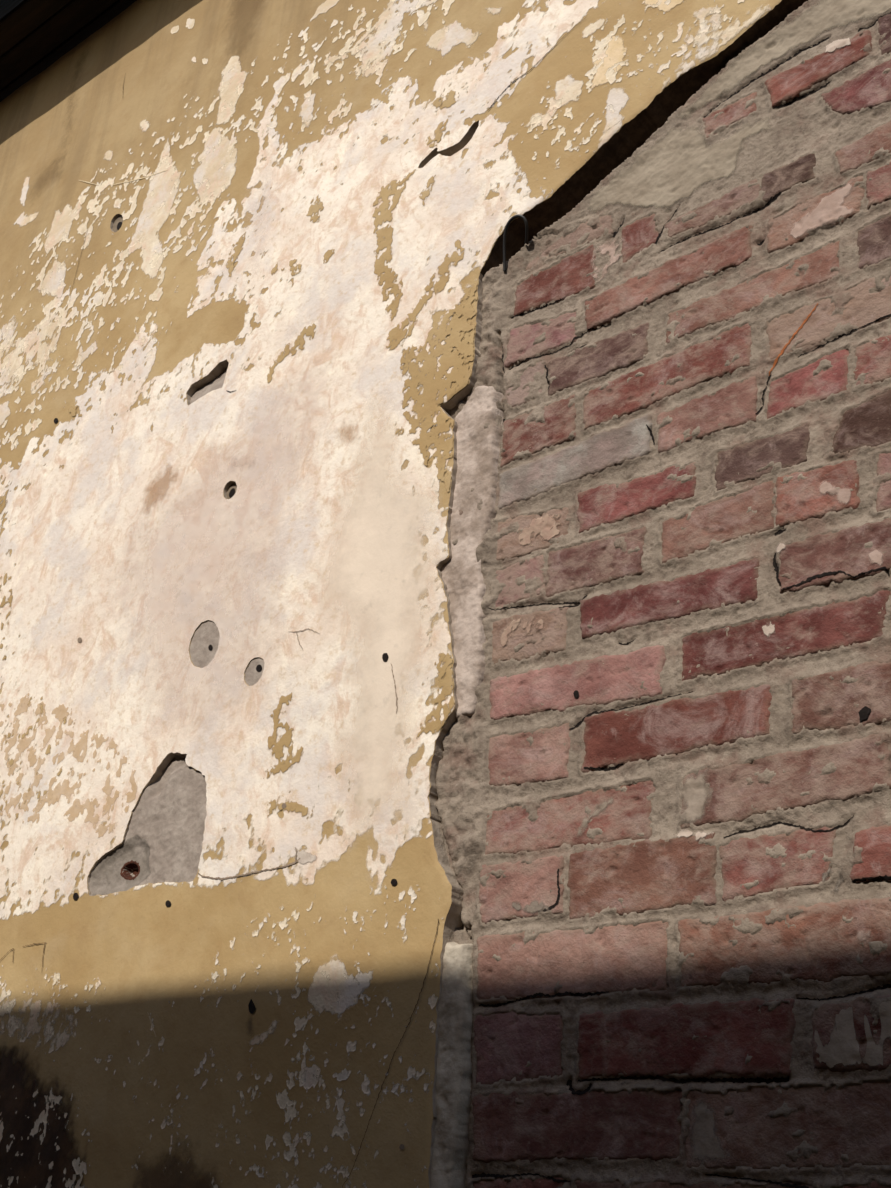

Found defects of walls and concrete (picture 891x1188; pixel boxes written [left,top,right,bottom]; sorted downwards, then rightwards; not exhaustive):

peeling [0,0,771,942]
peeling [0,965,110,1061]
peeling [194,953,245,1007]
peeling [194,1021,277,1122]
peeling [211,894,433,1188]
crack [343,919,439,1185]